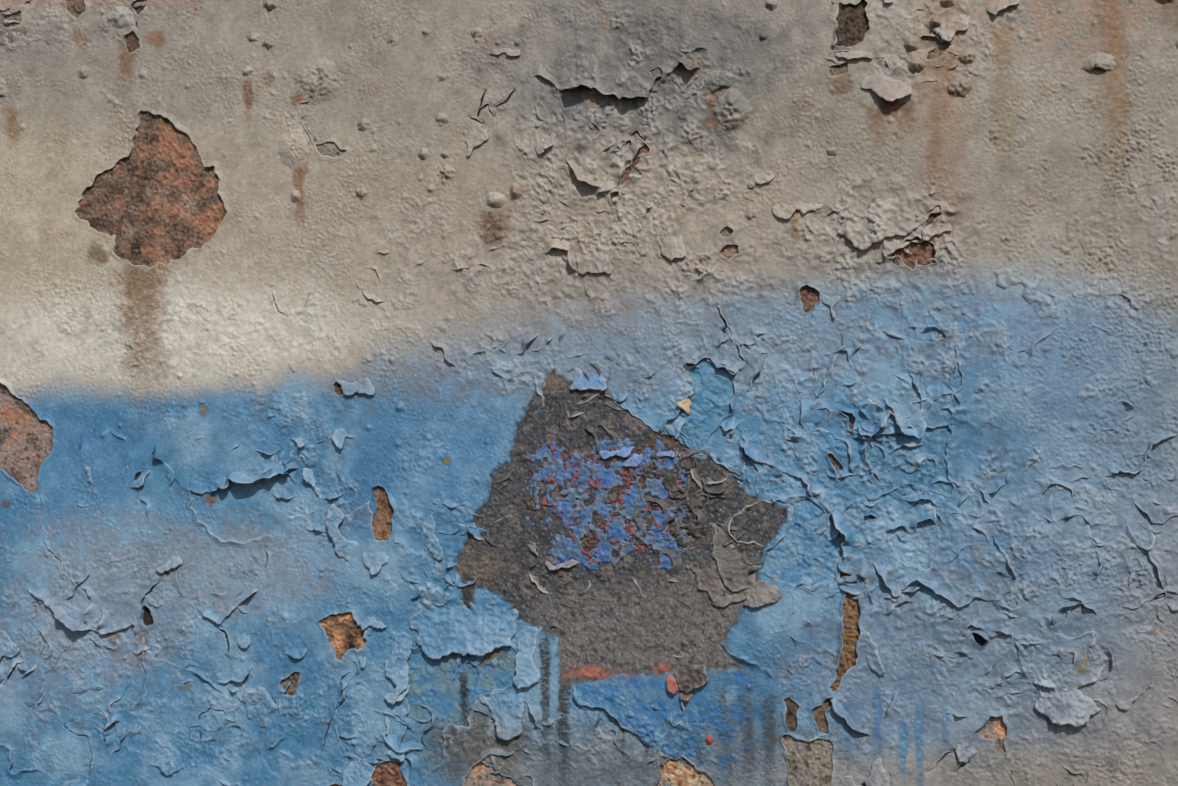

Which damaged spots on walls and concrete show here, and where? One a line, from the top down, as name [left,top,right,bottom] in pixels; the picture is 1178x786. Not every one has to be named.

rust [929,0,956,28]
peeling [986,0,1020,15]
peeling [823,0,993,101]
rust [903,38,977,73]
rust [947,78,972,97]
peeling [531,47,706,296]
rust [71,105,232,337]
peeling [638,181,742,281]
peeling [794,283,840,318]
peeling [330,377,375,399]
peeling [130,409,681,786]
peeling [779,731,839,786]